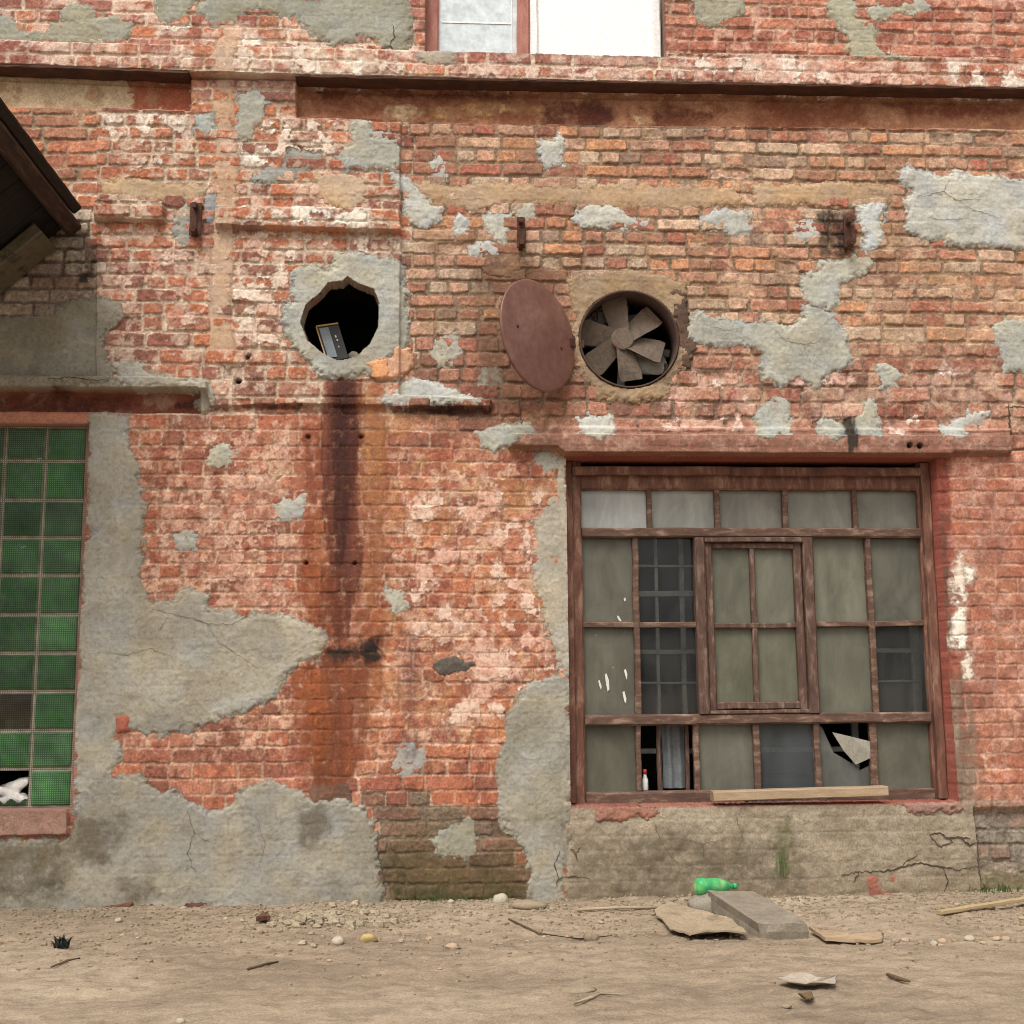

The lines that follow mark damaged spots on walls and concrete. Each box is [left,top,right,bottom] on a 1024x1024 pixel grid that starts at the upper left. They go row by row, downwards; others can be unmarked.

peeling [233,204,378,364]
spalling [366,346,414,383]
peeling [822,373,855,390]
peeling [660,393,696,432]
peeling [709,379,749,432]
peeling [888,415,920,436]
crack [115,609,254,666]
spalling [115,715,131,734]
spalling [308,783,352,803]
crack [841,809,982,892]